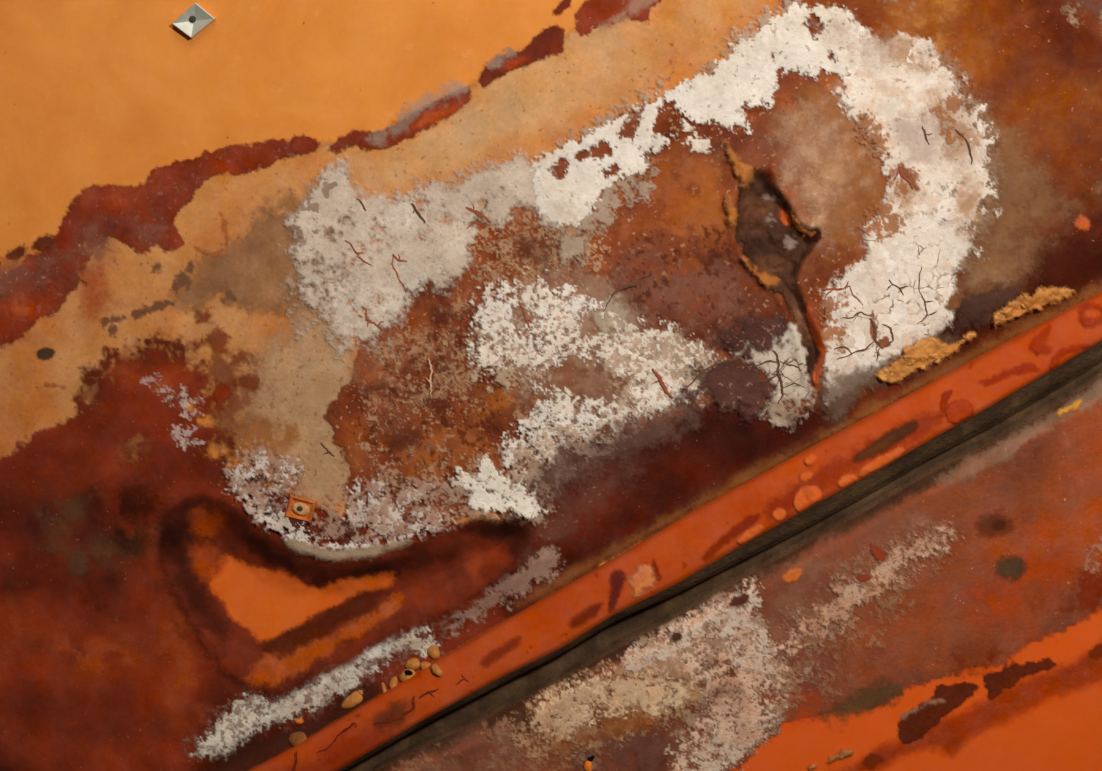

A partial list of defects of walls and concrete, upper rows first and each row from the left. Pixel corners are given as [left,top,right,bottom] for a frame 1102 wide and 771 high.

corrosion [194,329,253,364]
corrosion [0,0,661,345]
damp [173,0,1001,562]
corrosion [303,67,891,551]
spalling [724,141,827,384]
crack [822,267,937,361]
crack [894,167,914,189]
crack [922,126,973,164]
damp [187,546,560,771]
damp [511,522,964,771]
corrosion [379,378,1102,771]
peeling [898,658,1056,743]